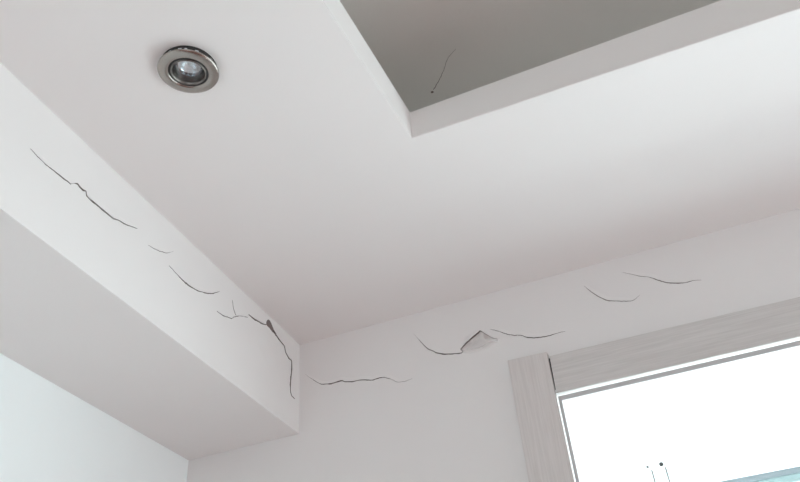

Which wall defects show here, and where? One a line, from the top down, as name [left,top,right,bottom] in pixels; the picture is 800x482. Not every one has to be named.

crack [31,148,137,228]
crack [584,271,701,302]
crack [148,244,412,399]
peeling [414,329,499,355]
crack [490,328,565,338]